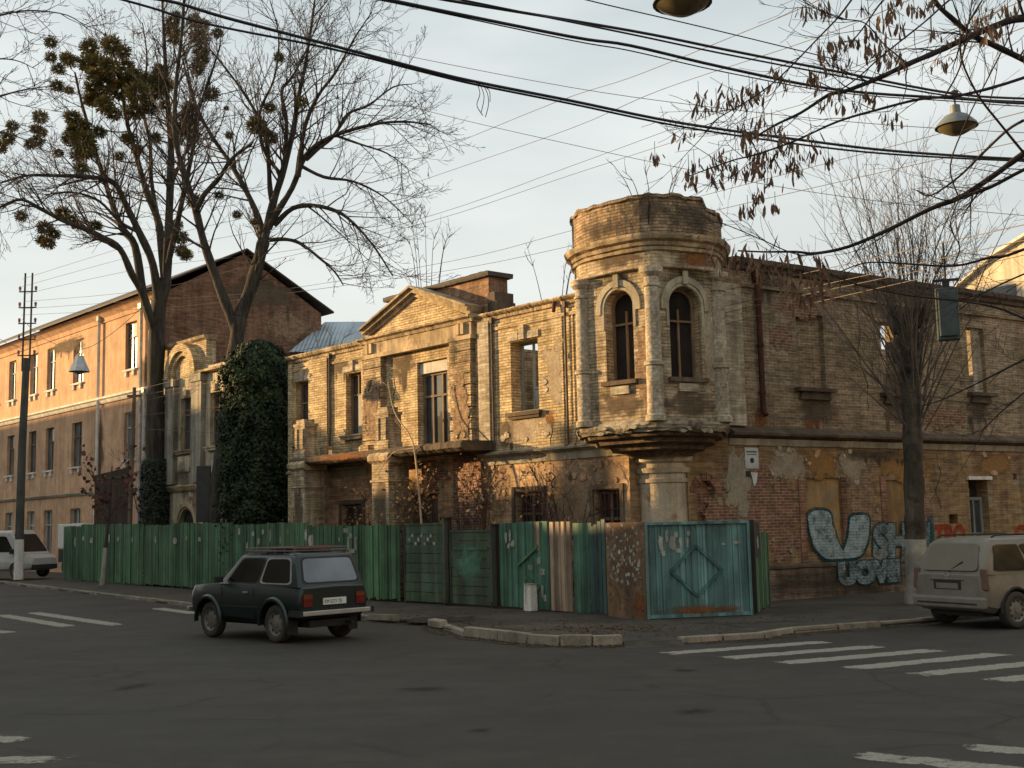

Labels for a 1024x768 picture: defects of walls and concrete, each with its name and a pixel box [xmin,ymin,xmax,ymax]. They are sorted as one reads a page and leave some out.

peeling [500,417,552,443]
peeling [837,449,904,485]
spalling [701,446,808,564]
rust [674,606,739,614]